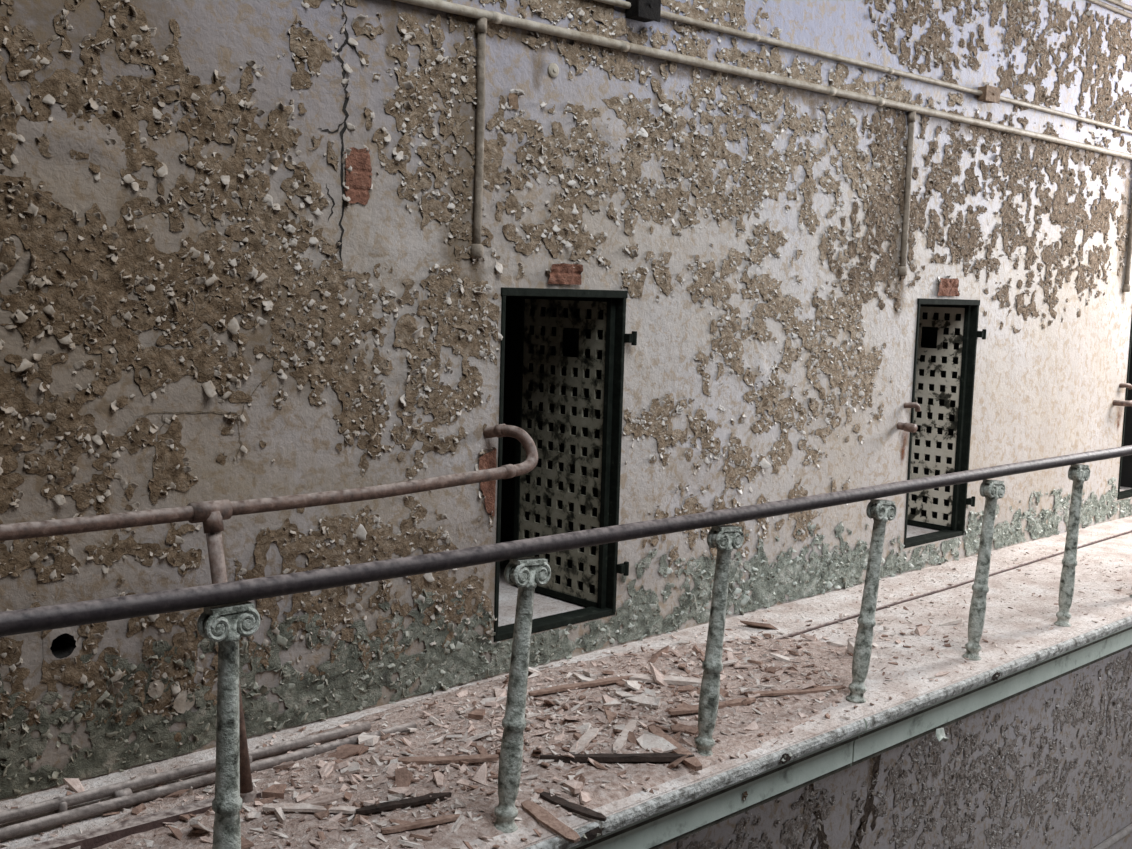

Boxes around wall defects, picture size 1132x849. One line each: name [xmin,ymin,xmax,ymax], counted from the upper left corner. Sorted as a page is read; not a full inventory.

peeling [0,608,218,799]
peeling [239,567,513,737]
peeling [529,527,717,668]